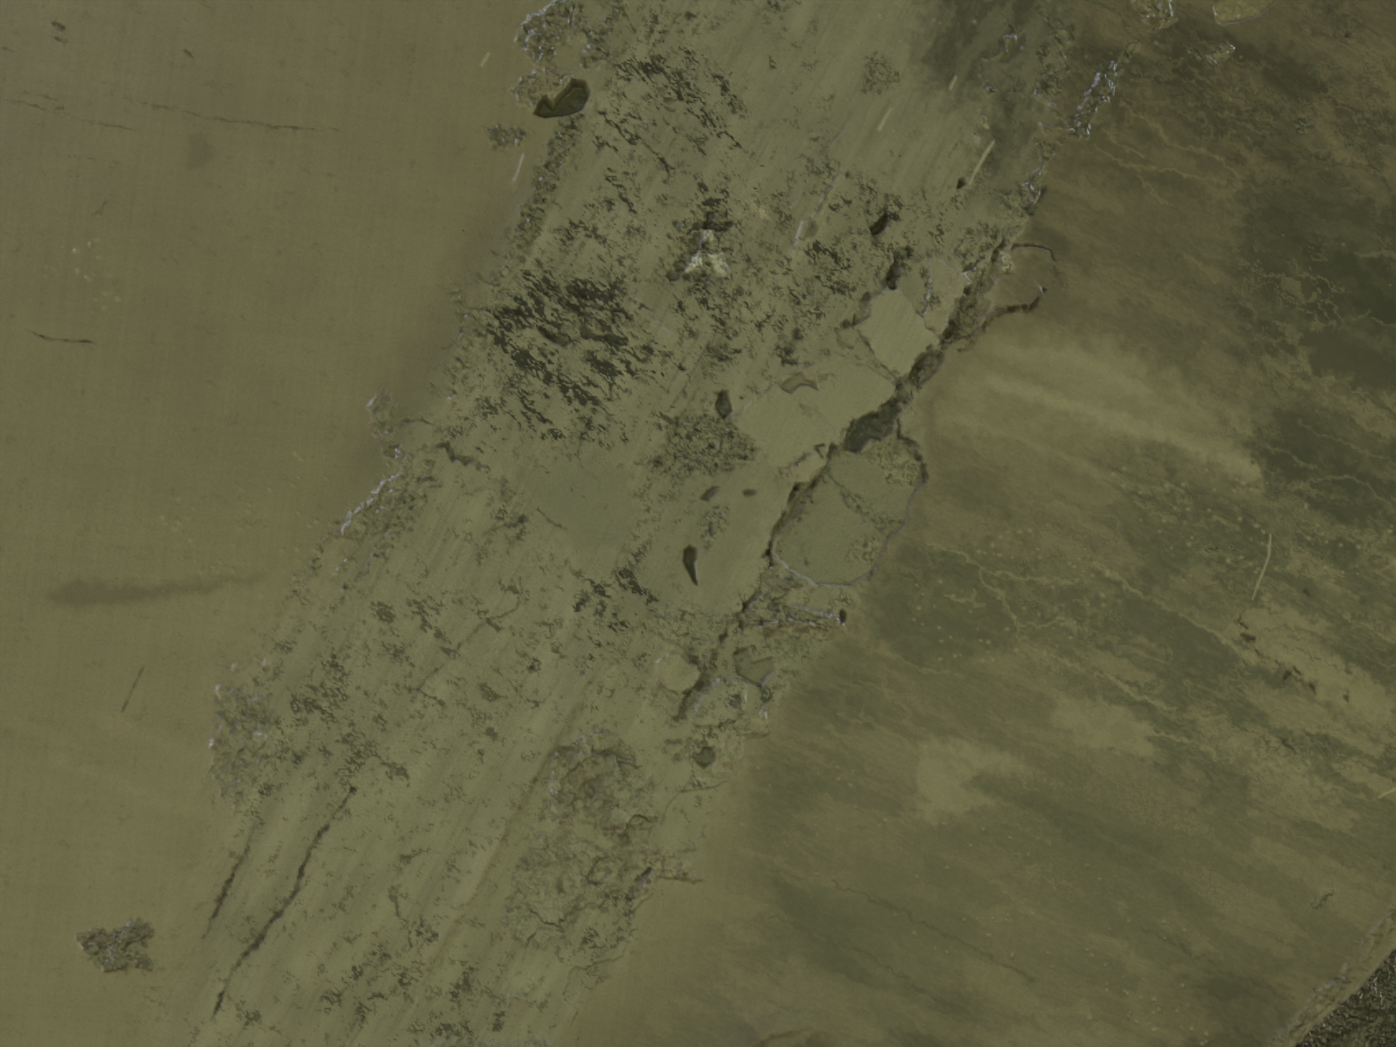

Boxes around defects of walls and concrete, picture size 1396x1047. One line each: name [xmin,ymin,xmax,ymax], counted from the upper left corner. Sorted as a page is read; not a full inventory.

spalling [1129,0,1180,35]
spalling [1187,0,1279,65]
spalling [204,0,1118,957]
crack [673,241,1068,727]
water stain [733,0,1396,1031]
crack [202,784,358,1023]